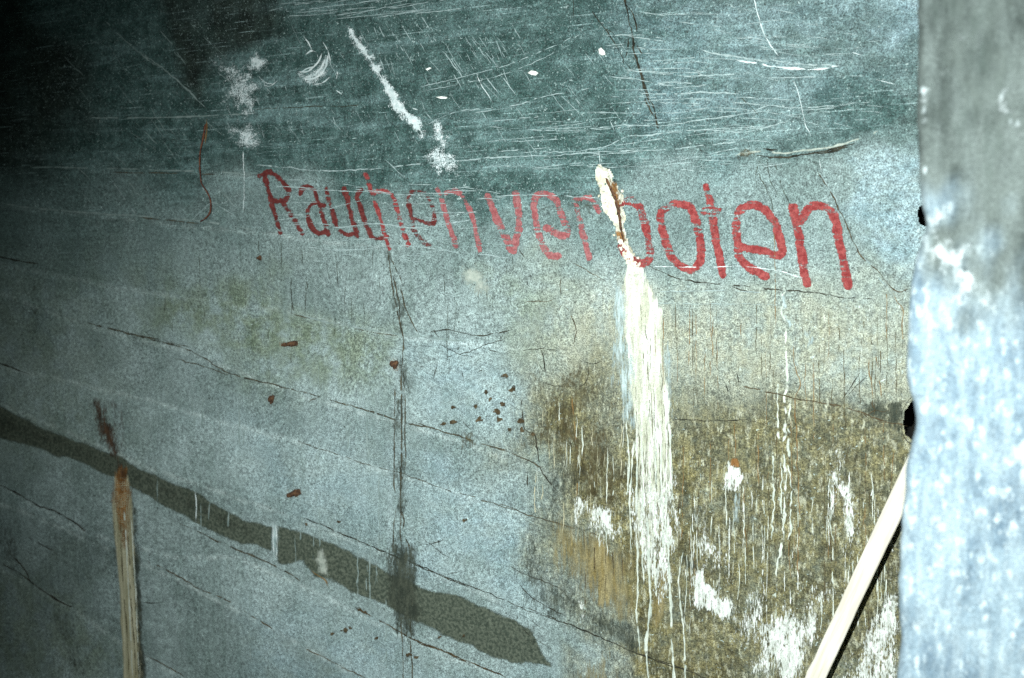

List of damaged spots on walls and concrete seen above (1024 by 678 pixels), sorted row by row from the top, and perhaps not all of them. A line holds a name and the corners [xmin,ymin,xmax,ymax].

crack [573,0,658,132]
corrosion [93,401,146,678]
leakage [0,407,551,667]
crack [429,263,605,490]
crack [512,567,566,649]
leakage [528,265,878,678]